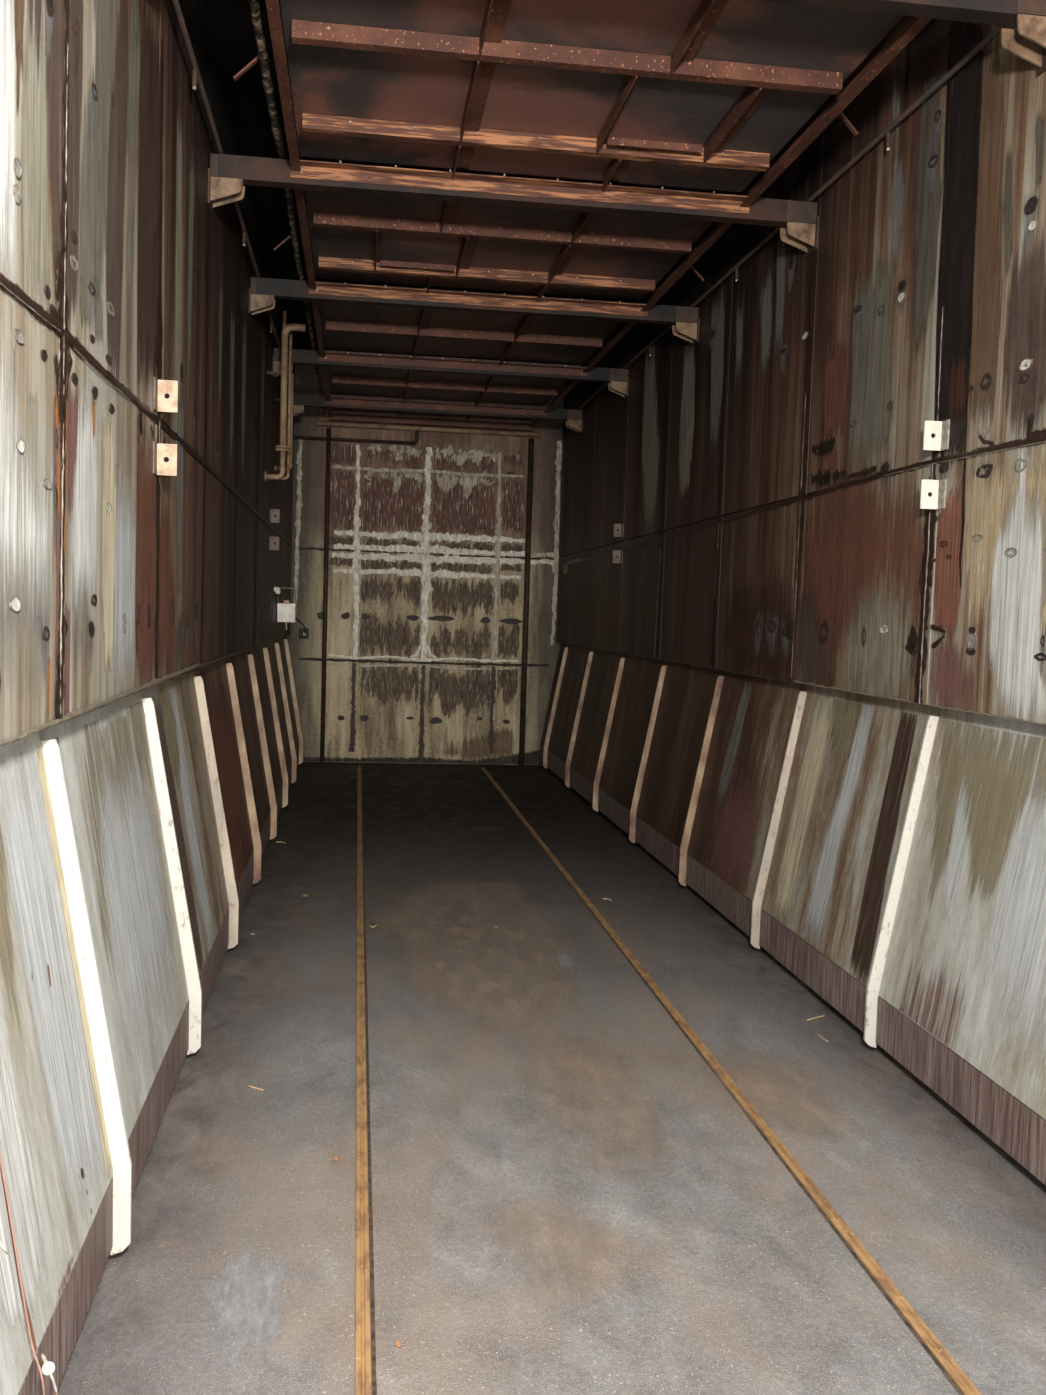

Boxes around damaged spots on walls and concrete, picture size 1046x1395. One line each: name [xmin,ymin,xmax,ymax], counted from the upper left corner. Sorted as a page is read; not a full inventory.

rust [137,7,162,386]
rust [949,45,1005,423]
rust [48,388,95,716]
damp [328,441,587,719]